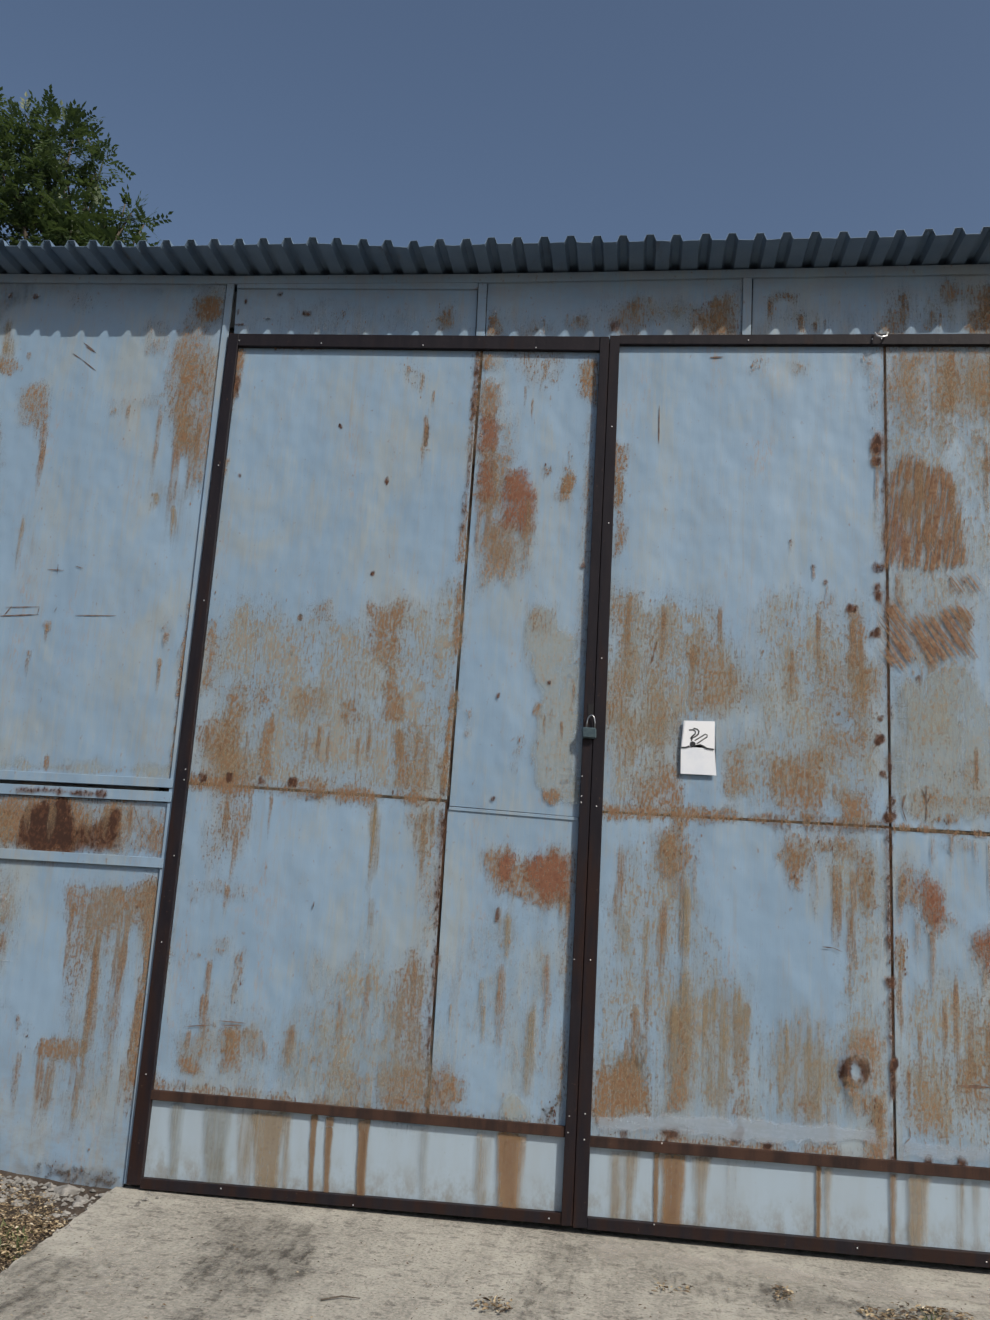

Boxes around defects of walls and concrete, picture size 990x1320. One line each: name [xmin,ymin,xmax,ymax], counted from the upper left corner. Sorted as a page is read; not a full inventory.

rust [111,291,247,532]
rust [455,351,593,586]
rust [609,293,740,335]
rust [863,280,990,777]
rust [0,786,165,856]
rust [11,876,159,1118]
rust [155,1027,296,1102]
rust [187,686,525,1209]
rust [484,844,575,988]
rust [543,789,560,805]
rust [540,1042,566,1124]
rust [592,797,990,1244]